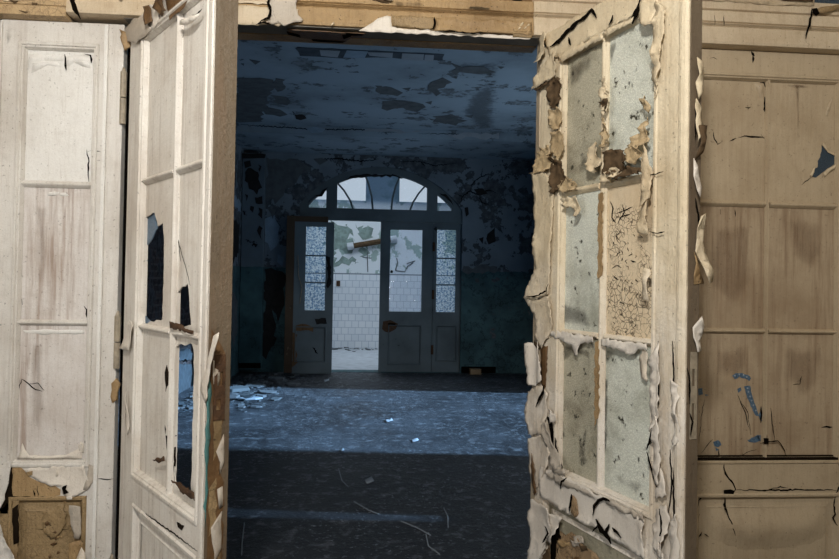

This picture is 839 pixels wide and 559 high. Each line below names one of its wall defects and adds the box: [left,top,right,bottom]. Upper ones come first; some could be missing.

peeling [143,0,187,29]
peeling [359,0,665,99]
crack [805,9,813,37]
peeling [236,78,306,123]
crack [694,109,764,144]
spalling [181,285,189,309]
peeling [233,161,286,359]
peeling [331,221,373,272]
crack [610,202,663,333]
peeling [523,172,680,559]
peeling [0,461,94,559]
crack [718,450,839,536]